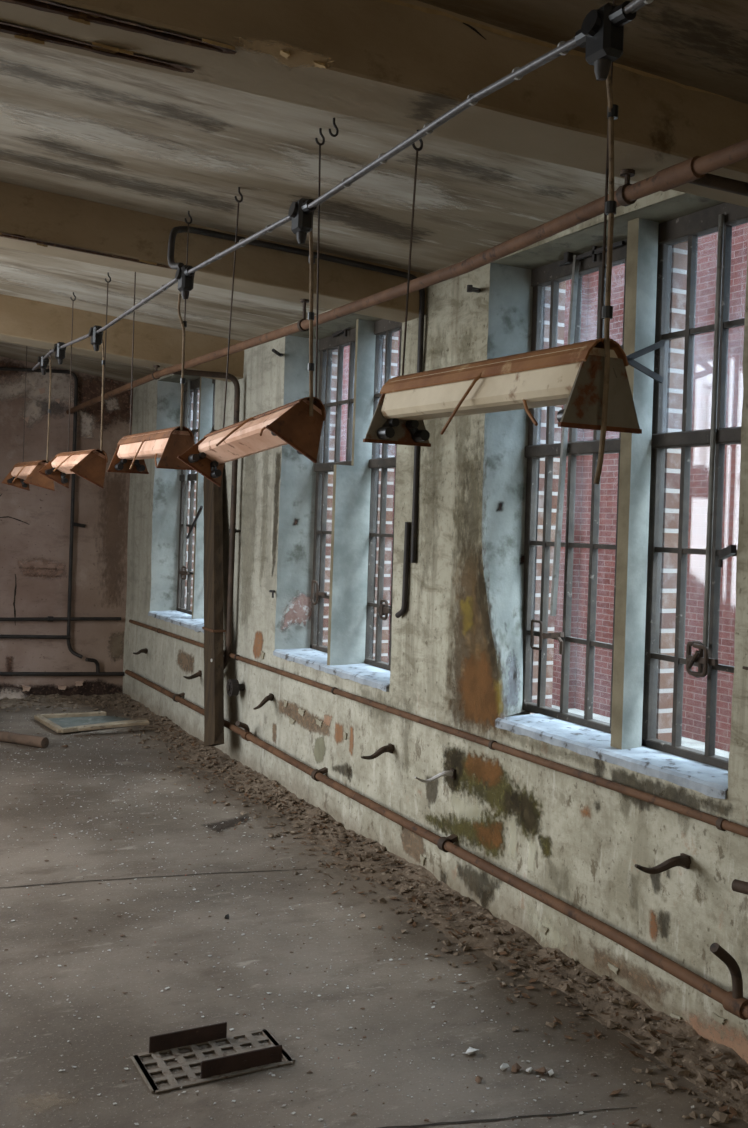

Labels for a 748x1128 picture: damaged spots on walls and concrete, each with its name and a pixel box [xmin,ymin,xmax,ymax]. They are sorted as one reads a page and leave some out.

spalling [0,0,330,73]
leakage [5,108,249,170]
leakage [281,145,456,209]
flaking render [0,359,133,437]
flaking render [282,590,312,629]
rust [447,546,507,733]
leakage [425,749,551,858]
leakage [440,865,500,908]
flaking render [594,949,669,1002]
flaking render [670,1012,748,1064]